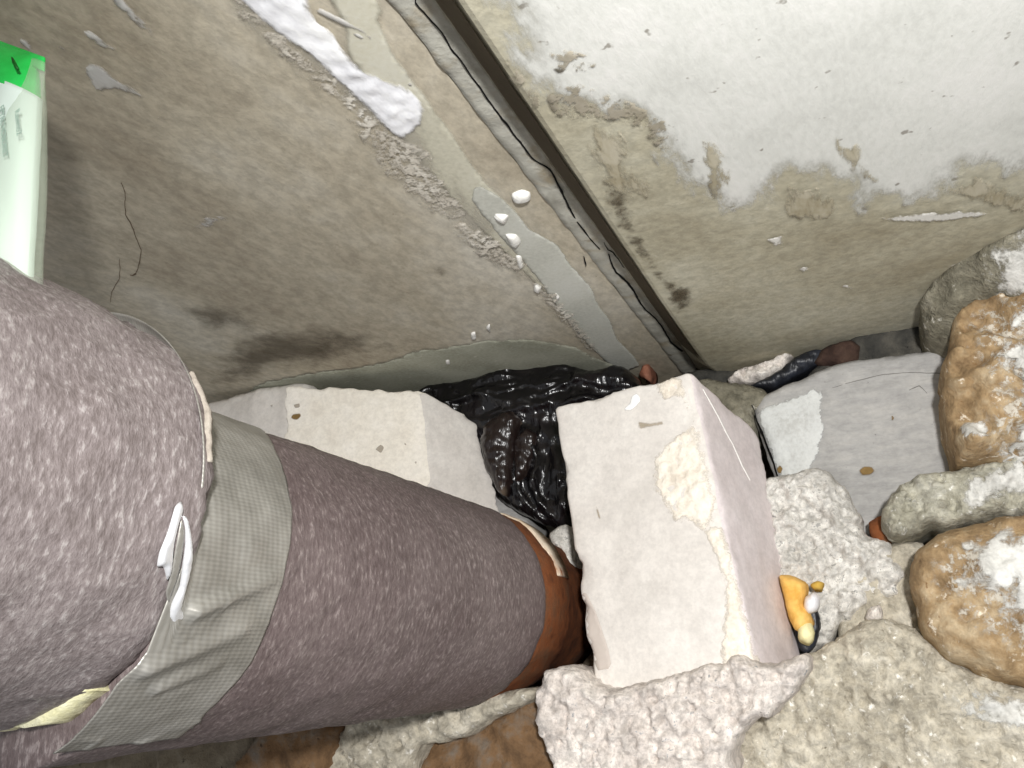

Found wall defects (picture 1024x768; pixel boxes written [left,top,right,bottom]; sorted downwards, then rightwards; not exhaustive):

crack [110,183,141,300]
leakage [241,337,340,363]
efflorescence [236,0,527,270]
leakage [436,0,699,359]
peeling [502,0,1024,222]